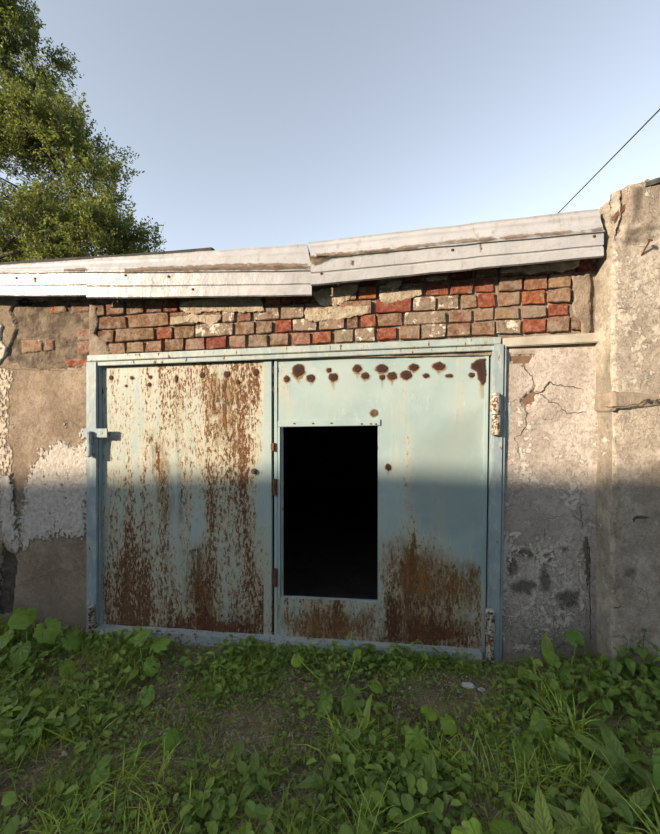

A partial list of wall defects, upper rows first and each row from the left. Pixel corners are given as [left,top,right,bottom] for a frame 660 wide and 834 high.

peeling [171,297,264,327]
peeling [304,284,370,322]
peeling [378,275,448,303]
peeling [499,260,580,276]
rust [352,362,453,381]
rust [469,358,486,385]
crack [506,367,660,455]
peeling [0,299,91,615]
rust [200,371,244,505]
rust [166,549,264,634]
rust [289,538,487,648]
damp [507,550,553,594]